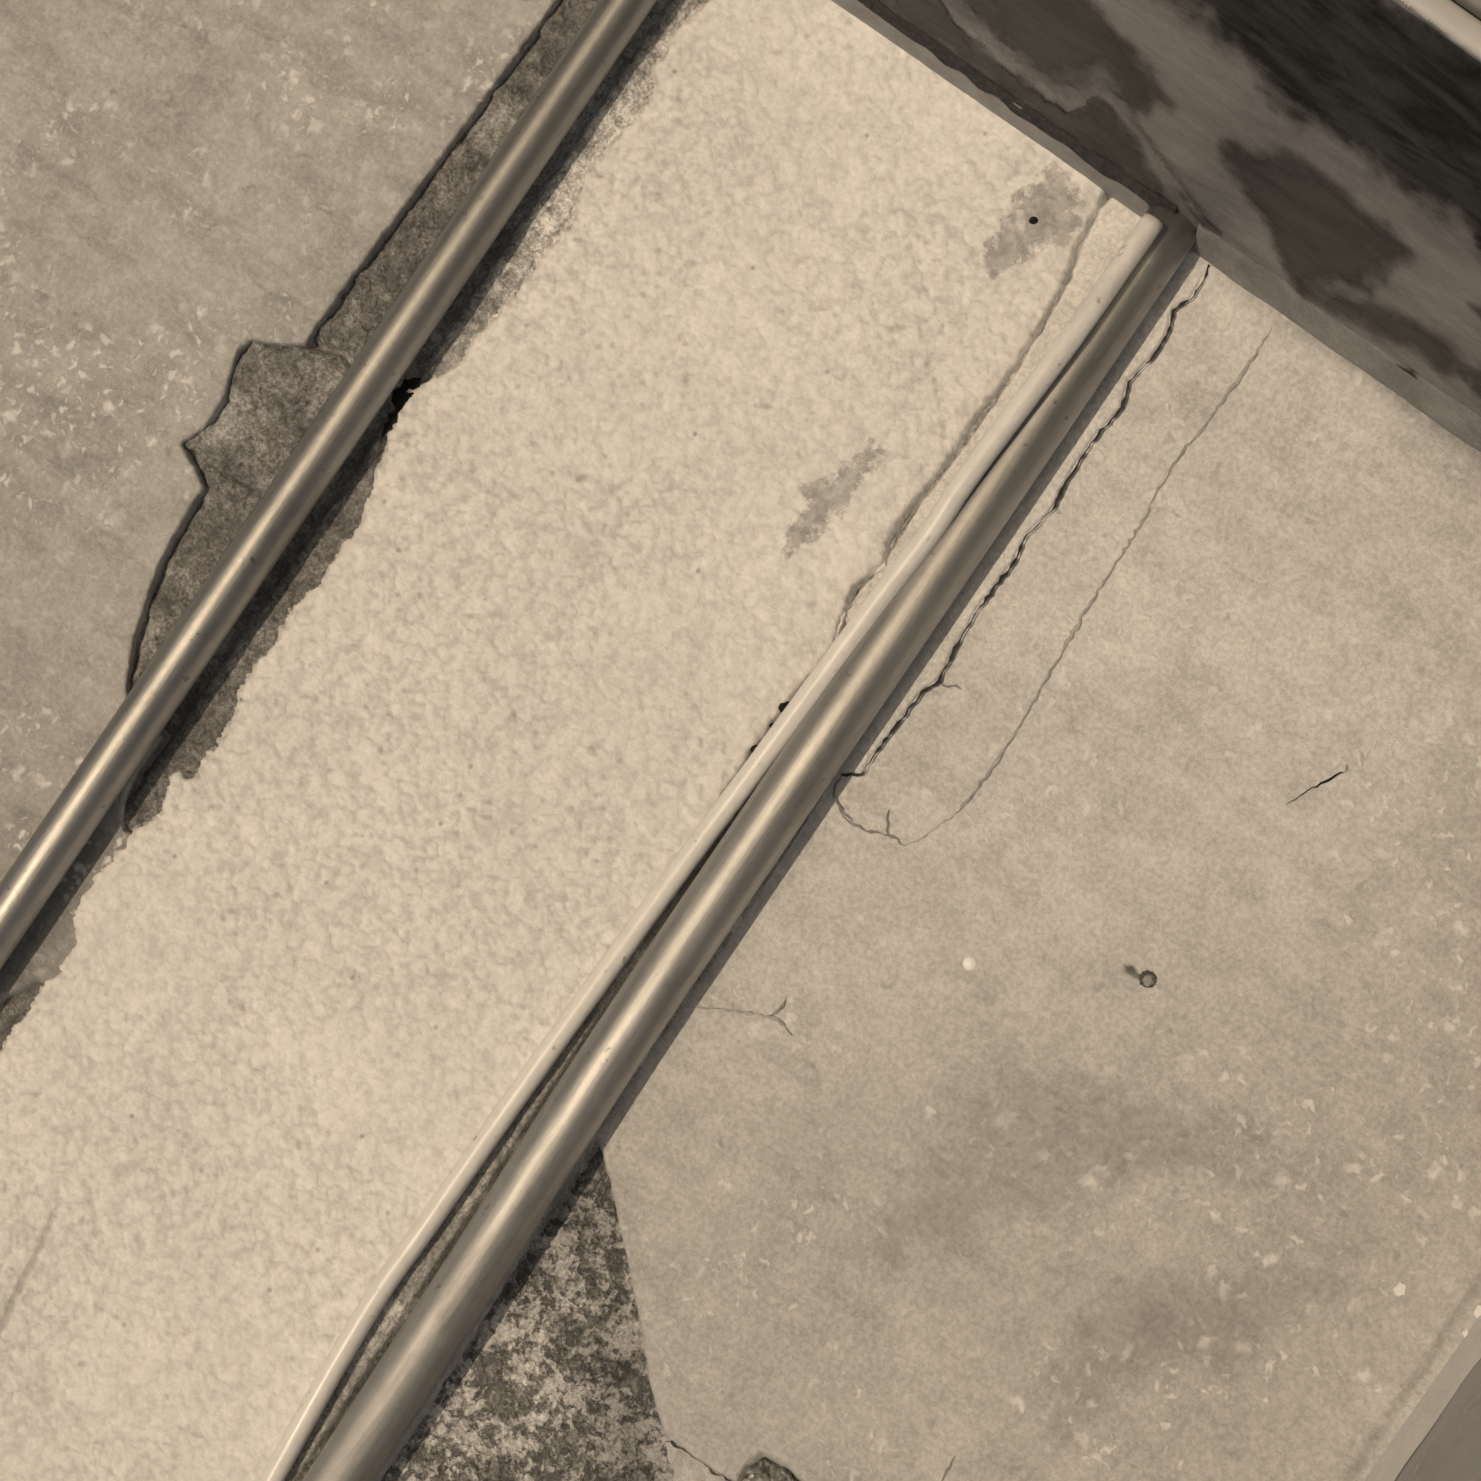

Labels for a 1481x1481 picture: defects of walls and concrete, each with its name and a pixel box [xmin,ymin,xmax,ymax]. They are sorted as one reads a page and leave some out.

leakage [876,0,1219,234]
leakage [1170,0,1481,250]
leakage [1220,141,1481,398]
spalling [124,0,708,832]
crack [832,195,1272,846]
crack [750,701,789,753]
spalling [381,1148,799,1481]